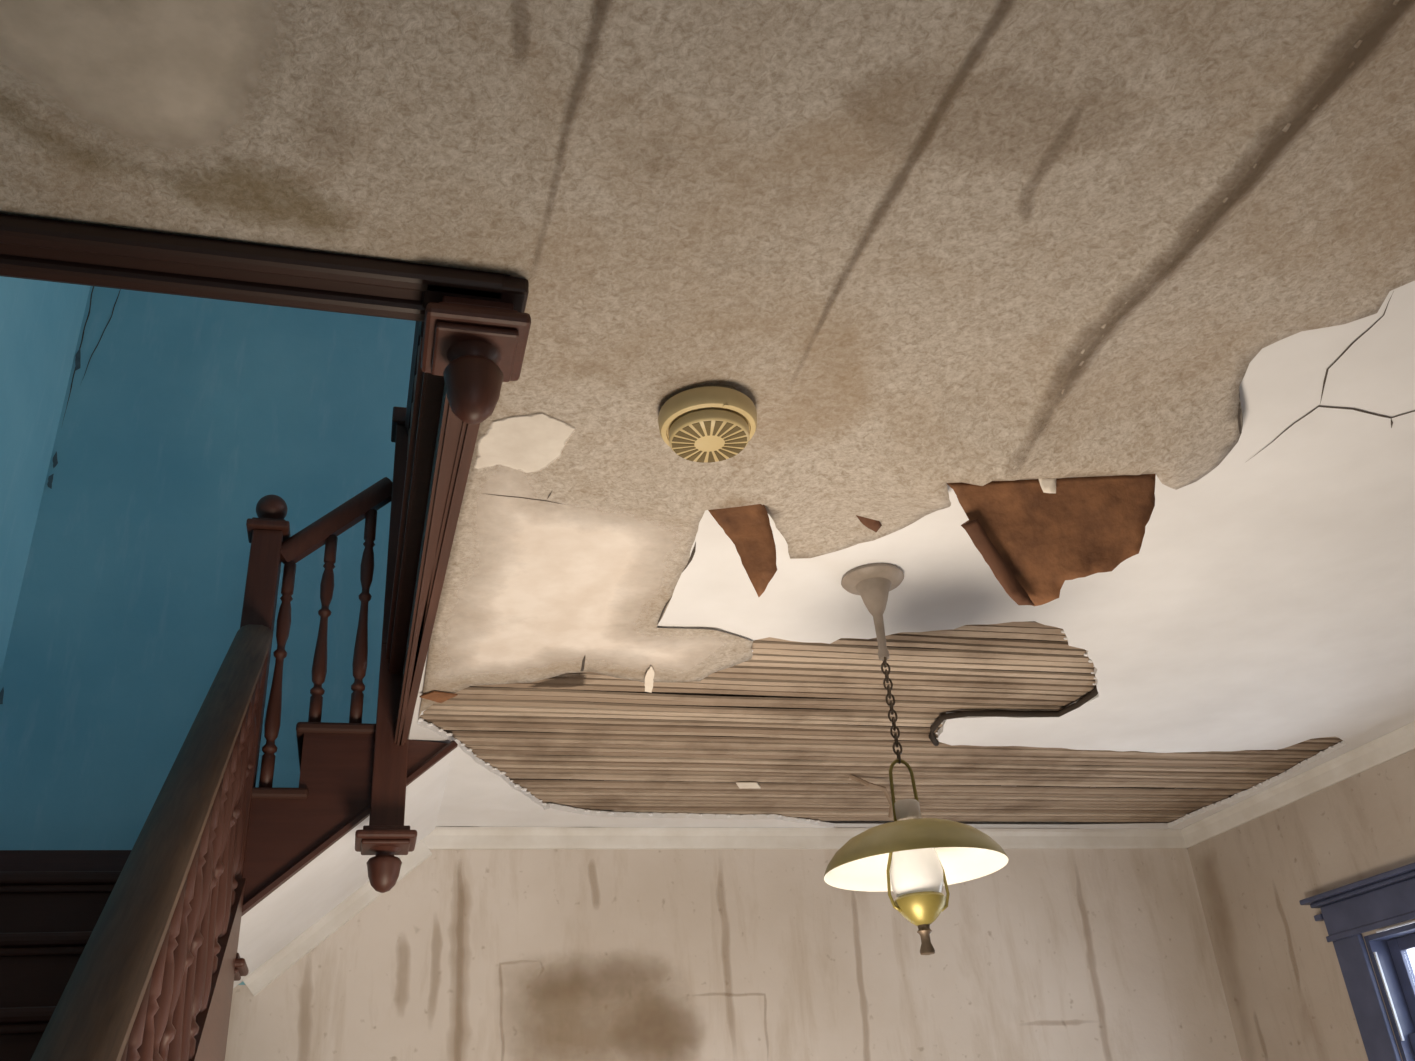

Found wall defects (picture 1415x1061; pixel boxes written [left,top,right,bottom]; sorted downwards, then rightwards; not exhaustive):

crack [1238,298,1415,462]
flaking render [418,414,1343,823]